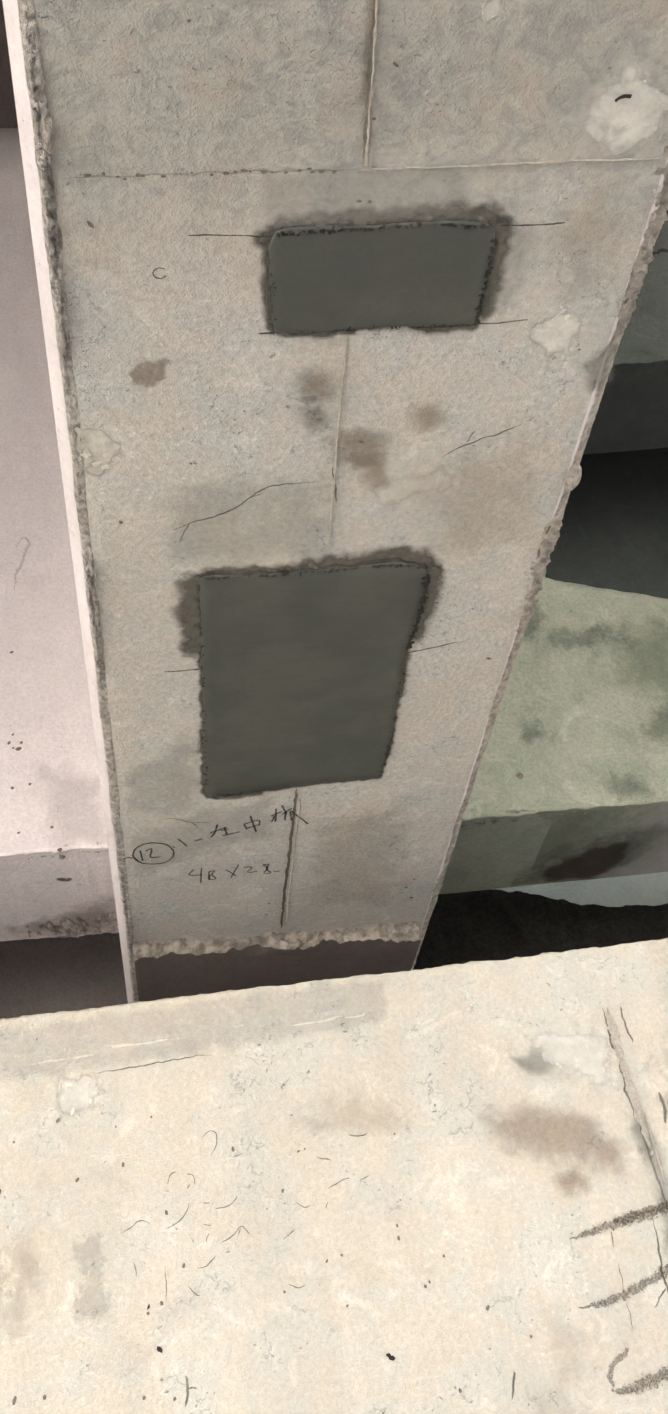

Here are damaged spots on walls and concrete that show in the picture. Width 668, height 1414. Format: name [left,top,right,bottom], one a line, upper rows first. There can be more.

peeling [587,69,668,149]
peeling [531,314,581,354]
spalling [572,145,668,466]
crack [172,468,337,542]
spalling [413,488,570,966]
crack [659,1092,667,1123]
crack [611,1215,668,1327]